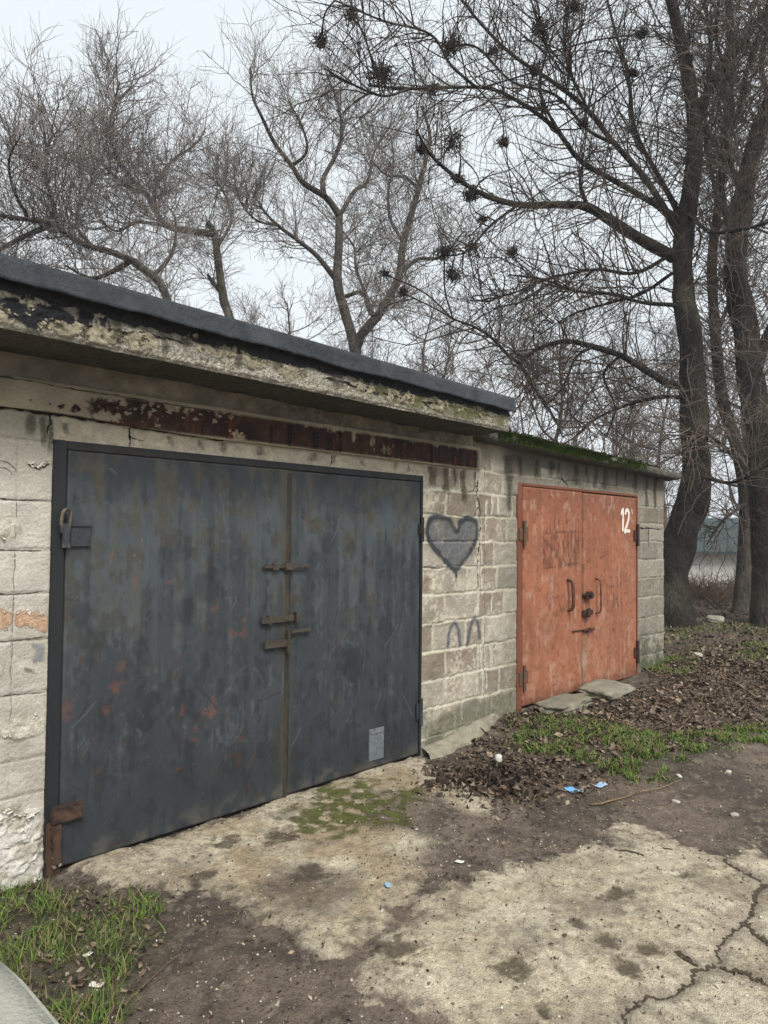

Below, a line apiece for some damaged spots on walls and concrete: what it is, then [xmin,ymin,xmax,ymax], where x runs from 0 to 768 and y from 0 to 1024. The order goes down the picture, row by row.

spalling [0,295,159,355]
spalling [181,334,308,382]
peeling [116,400,245,439]
spalling [353,378,417,405]
spalling [433,396,484,419]
damp [484,458,522,530]
peeling [0,609,48,633]
crack [621,859,768,1024]